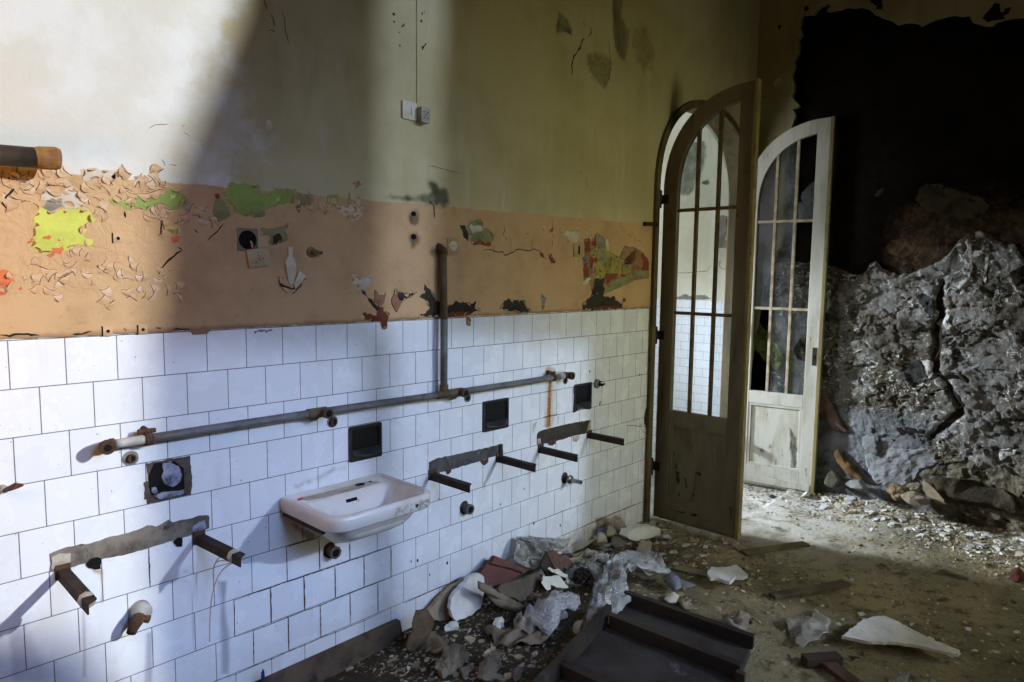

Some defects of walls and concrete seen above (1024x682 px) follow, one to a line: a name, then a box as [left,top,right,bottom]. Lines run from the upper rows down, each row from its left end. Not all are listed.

crack [570,22,611,84]
water stain [406,182,448,206]
peeling [0,164,314,310]
crack [486,238,553,259]
peeling [550,227,649,311]
flaking render [751,135,817,395]
flaking render [794,5,1024,532]
peeling [352,274,481,329]
peeling [500,294,547,313]
rust [543,381,557,427]
hole [149,461,185,496]
spalling [49,515,209,572]